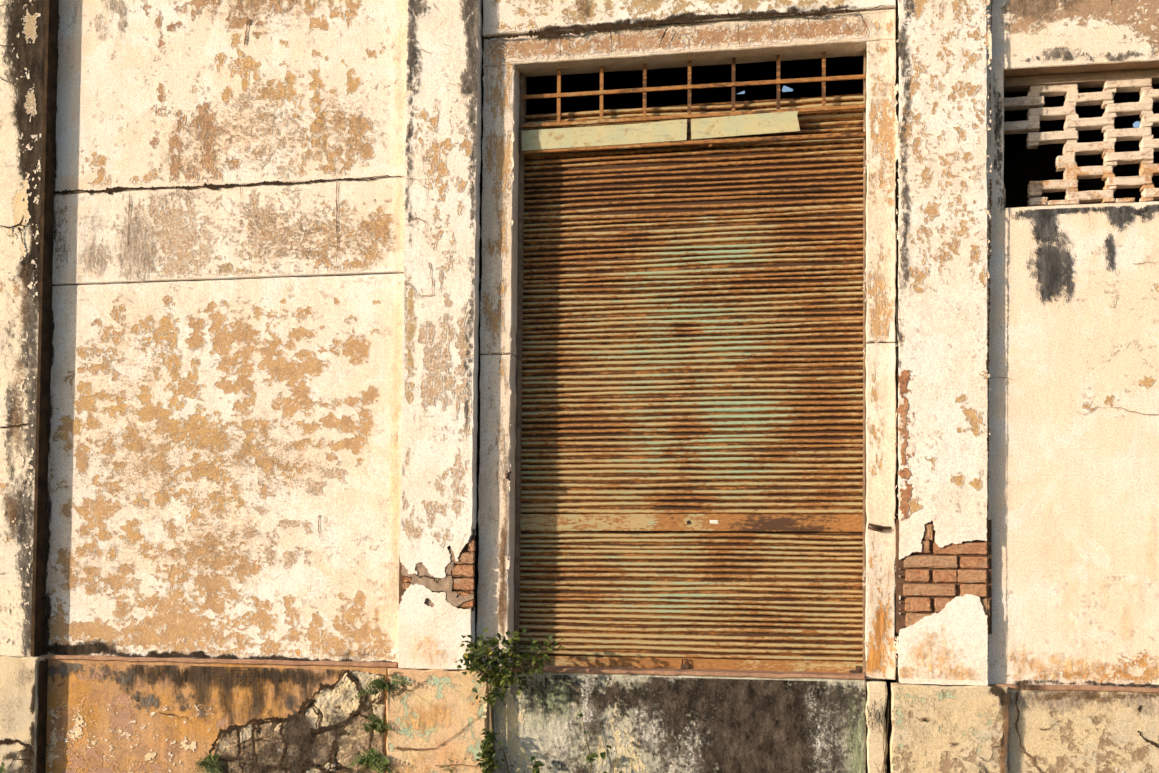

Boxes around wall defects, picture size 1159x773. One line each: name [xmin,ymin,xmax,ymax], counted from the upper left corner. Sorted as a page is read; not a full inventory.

spalling [997,0,1159,58]
water stain [993,78,1159,307]
water stain [1,0,391,773]
peeling [45,0,1013,680]
peeling [1075,283,1159,418]
peeling [997,591,1159,684]
peeling [46,664,233,773]
peeling [387,673,555,773]
peeling [543,677,648,773]
water stain [522,675,866,773]
crack [1137,705,1159,748]